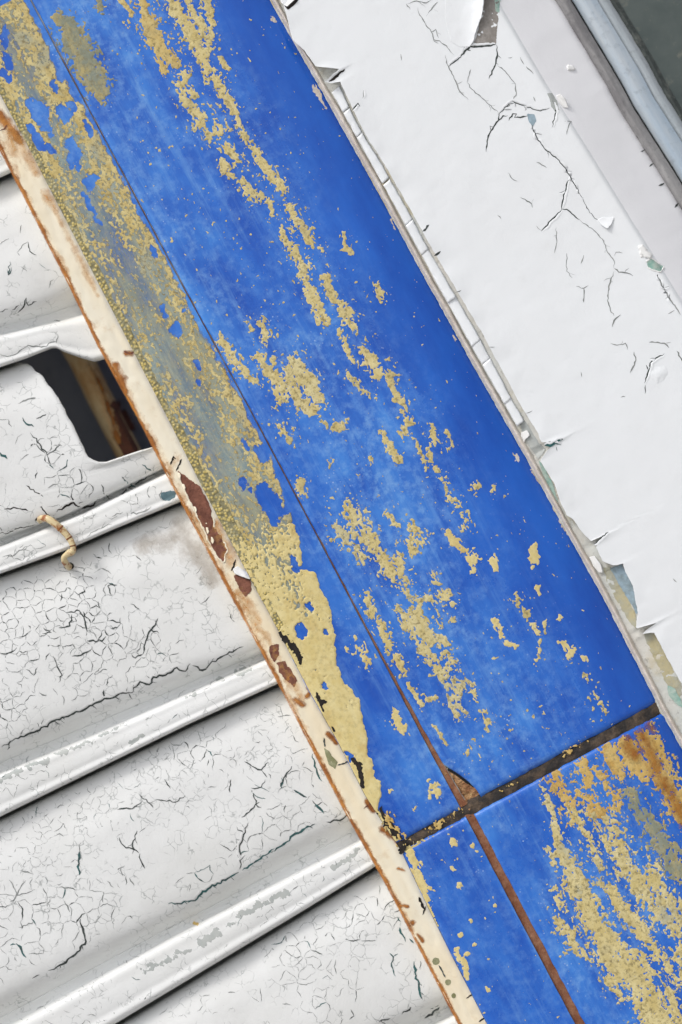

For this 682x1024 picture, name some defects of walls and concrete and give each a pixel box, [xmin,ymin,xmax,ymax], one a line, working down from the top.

crack [0,382,445,1024]
corrosion [0,110,462,1024]
peeling [0,0,509,926]
peeling [270,0,682,1024]
crack [406,0,682,397]
corrosion [622,722,682,825]